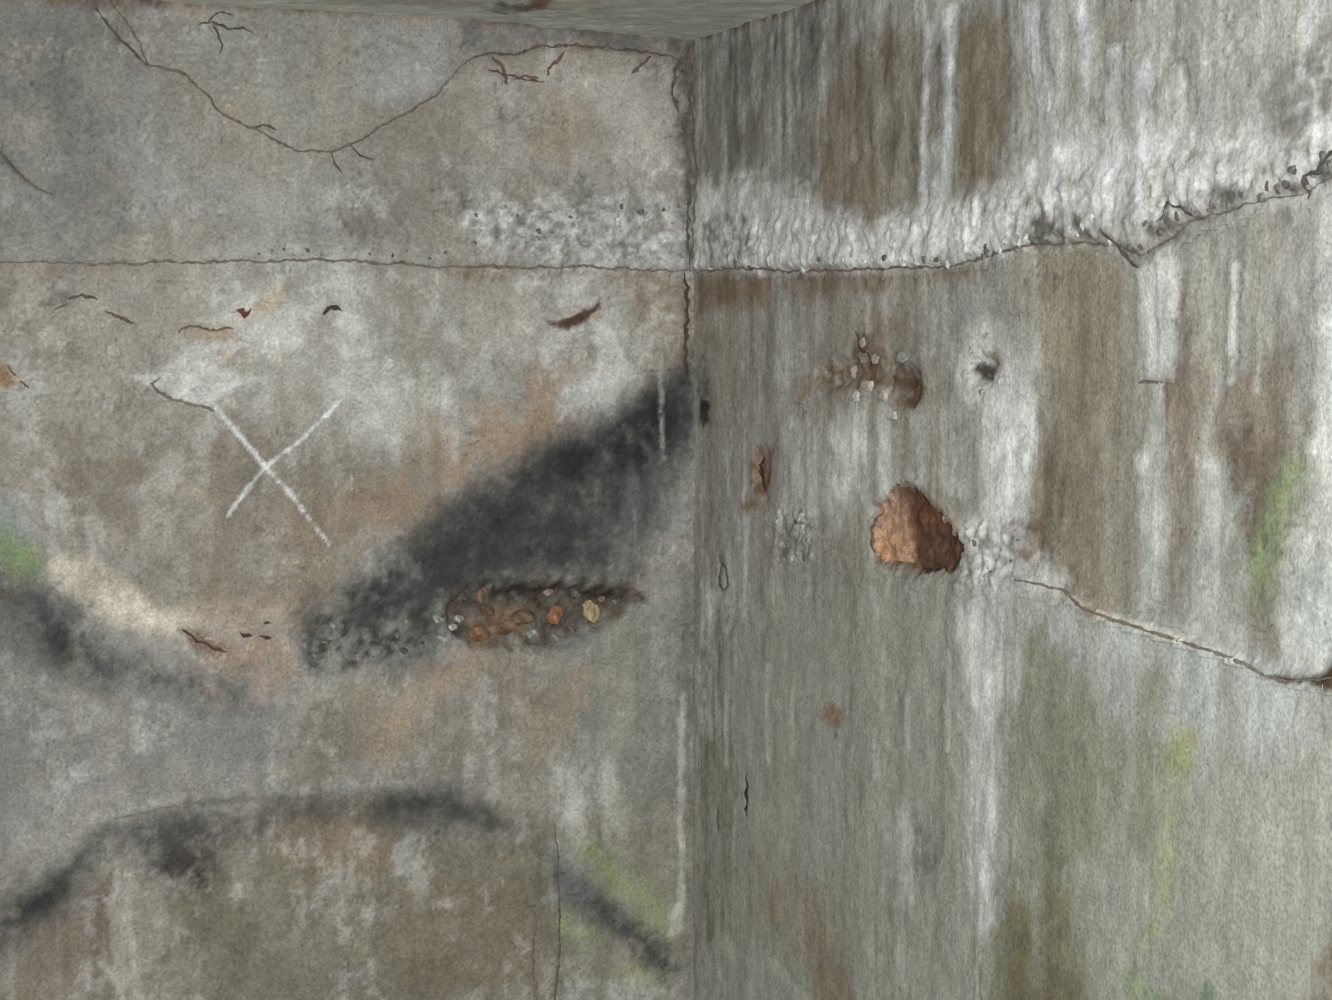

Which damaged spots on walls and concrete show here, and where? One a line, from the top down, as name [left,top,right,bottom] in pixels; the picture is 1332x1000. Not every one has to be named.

crack [95,1,461,173]
crack [0,43,1332,378]
damp [179,179,695,487]
spalling [792,296,932,421]
corrosion [735,443,775,521]
damp [692,0,1332,1000]
spalling [290,570,652,687]
damp [546,423,752,945]
damp [534,945,558,1000]